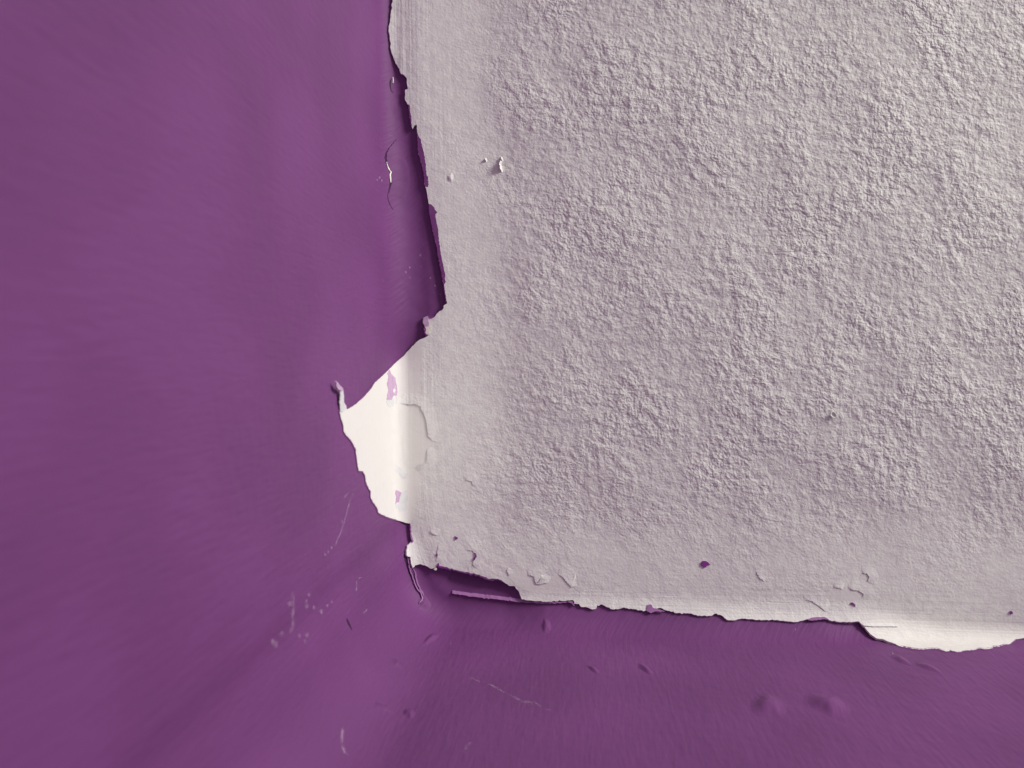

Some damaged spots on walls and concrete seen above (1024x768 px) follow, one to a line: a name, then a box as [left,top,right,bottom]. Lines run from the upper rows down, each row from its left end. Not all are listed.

peeling [408,105,429,187]
peeling [429,204,447,302]
peeling [335,316,443,524]
peeling [507,561,577,594]
peeling [825,564,879,602]
peeling [859,619,1024,653]